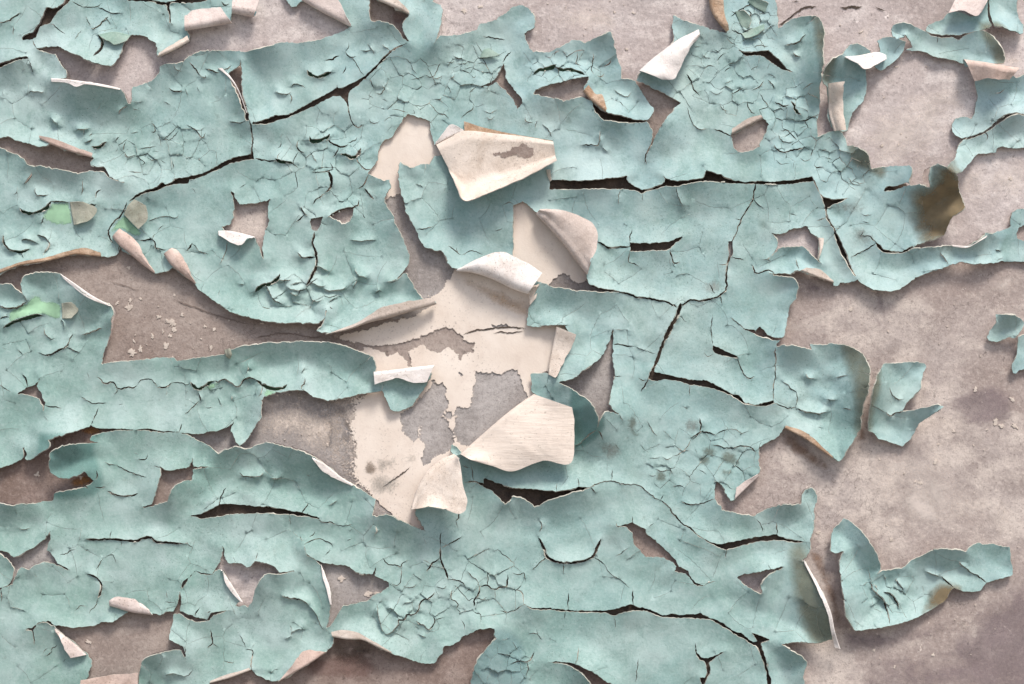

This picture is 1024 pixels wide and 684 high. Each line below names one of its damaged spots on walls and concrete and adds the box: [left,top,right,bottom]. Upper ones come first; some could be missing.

crack [0,0,227,67]
crack [533,52,611,75]
crack [4,176,63,254]
crack [89,36,511,307]
crack [550,0,911,413]
damp [916,167,967,240]
peeling [714,36,1024,684]
crack [82,370,305,430]
peeling [0,147,871,684]
crack [191,476,350,543]
crack [64,536,192,609]
crack [384,421,802,684]